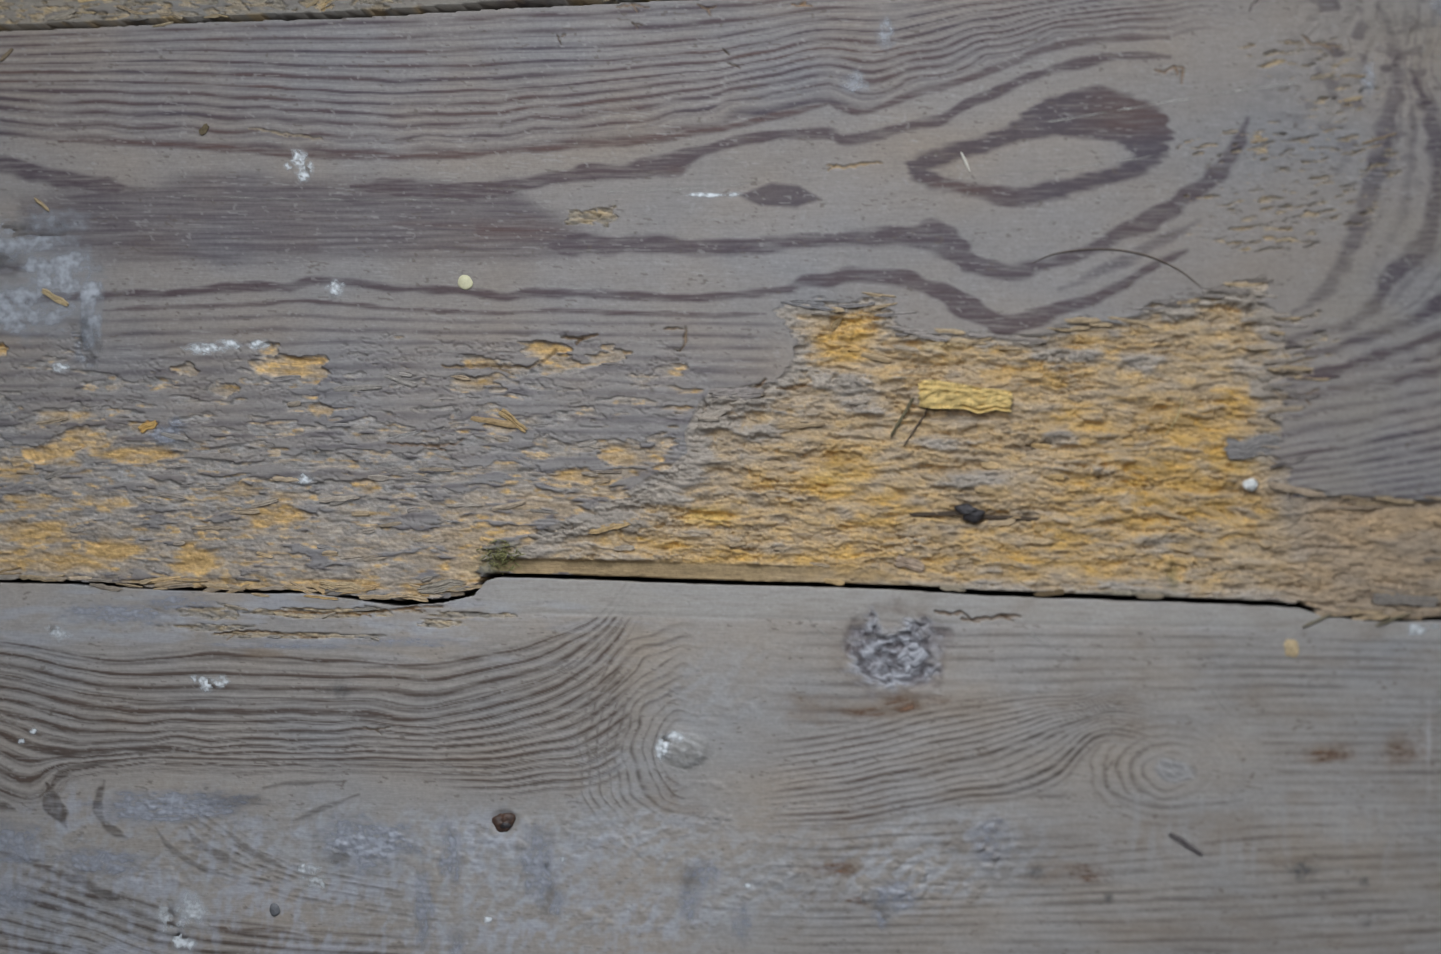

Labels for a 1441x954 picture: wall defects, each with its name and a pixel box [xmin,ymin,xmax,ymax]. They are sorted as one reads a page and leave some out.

peeling [0,0,393,27]
peeling [892,328,992,351]
peeling [1012,316,1150,345]
peeling [1238,310,1339,399]
peeling [132,420,189,441]
peeling [470,408,548,442]
peeling [1224,415,1441,509]
peeling [1313,588,1441,620]